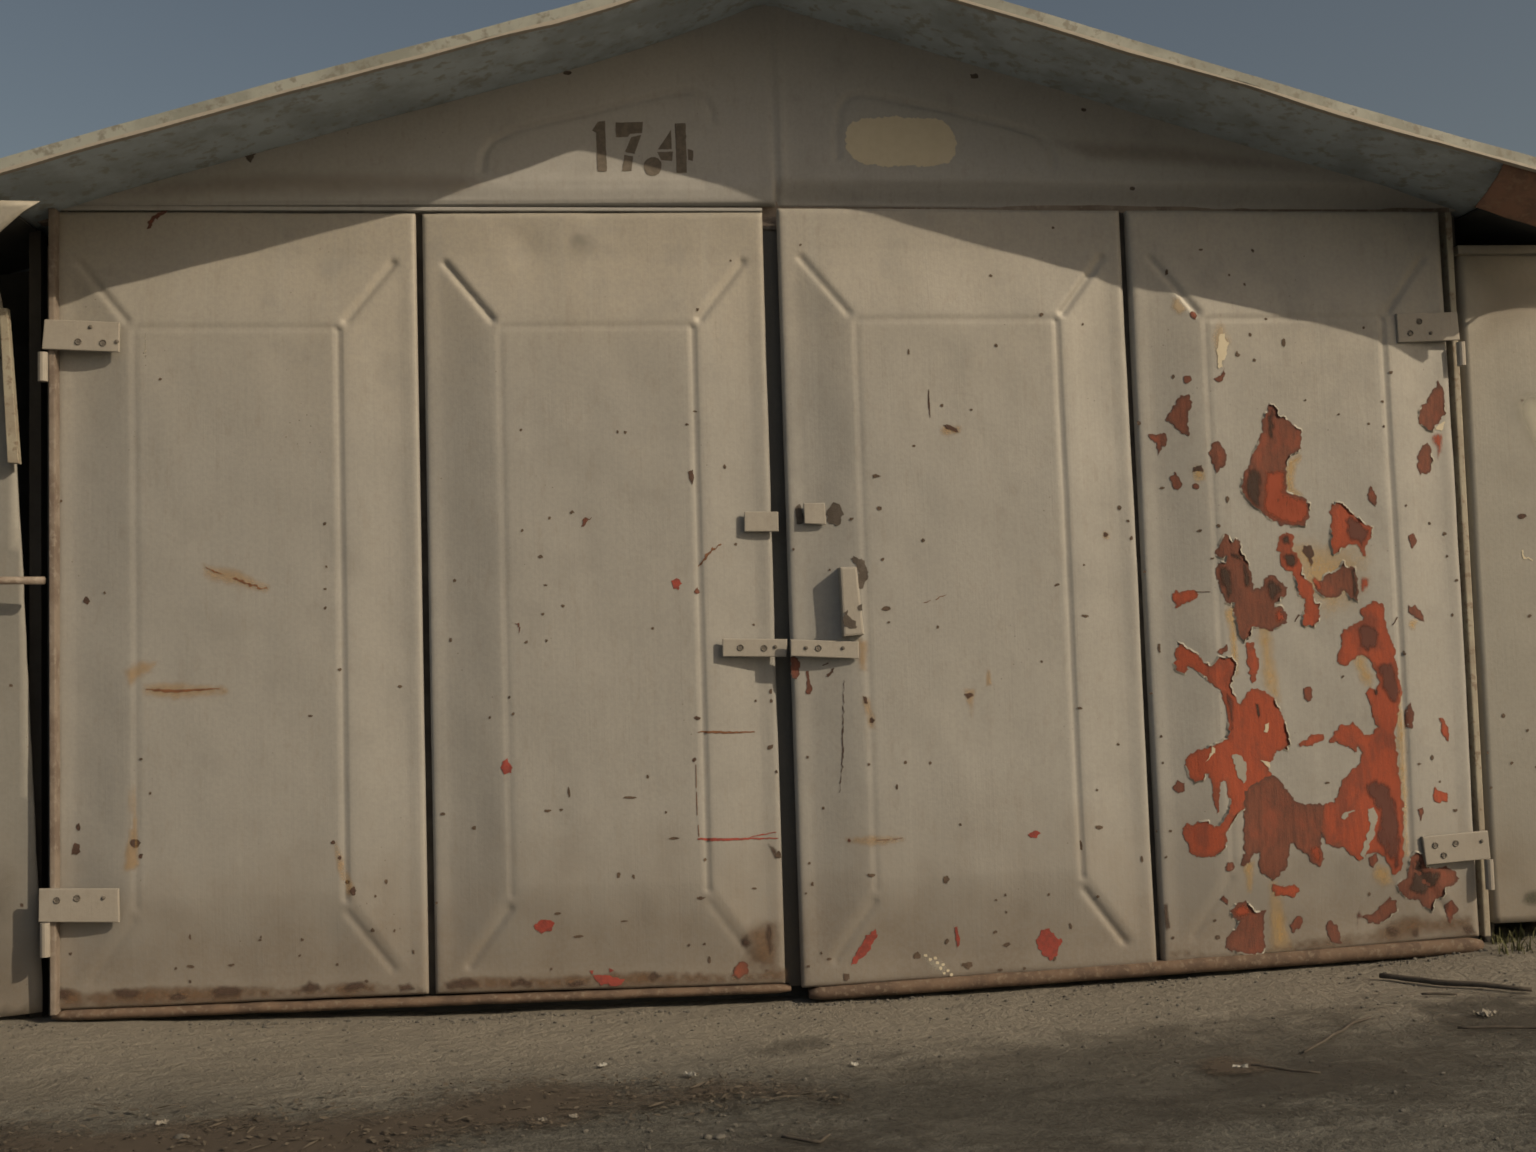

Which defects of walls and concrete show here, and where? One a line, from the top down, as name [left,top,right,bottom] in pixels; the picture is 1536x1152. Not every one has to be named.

peeling [1214,333,1229,382]
peeling [1148,376,1193,455]
peeling [1417,380,1447,474]
peeling [1170,403,1459,955]
peeling [851,929,878,965]
peeling [1036,928,1062,961]